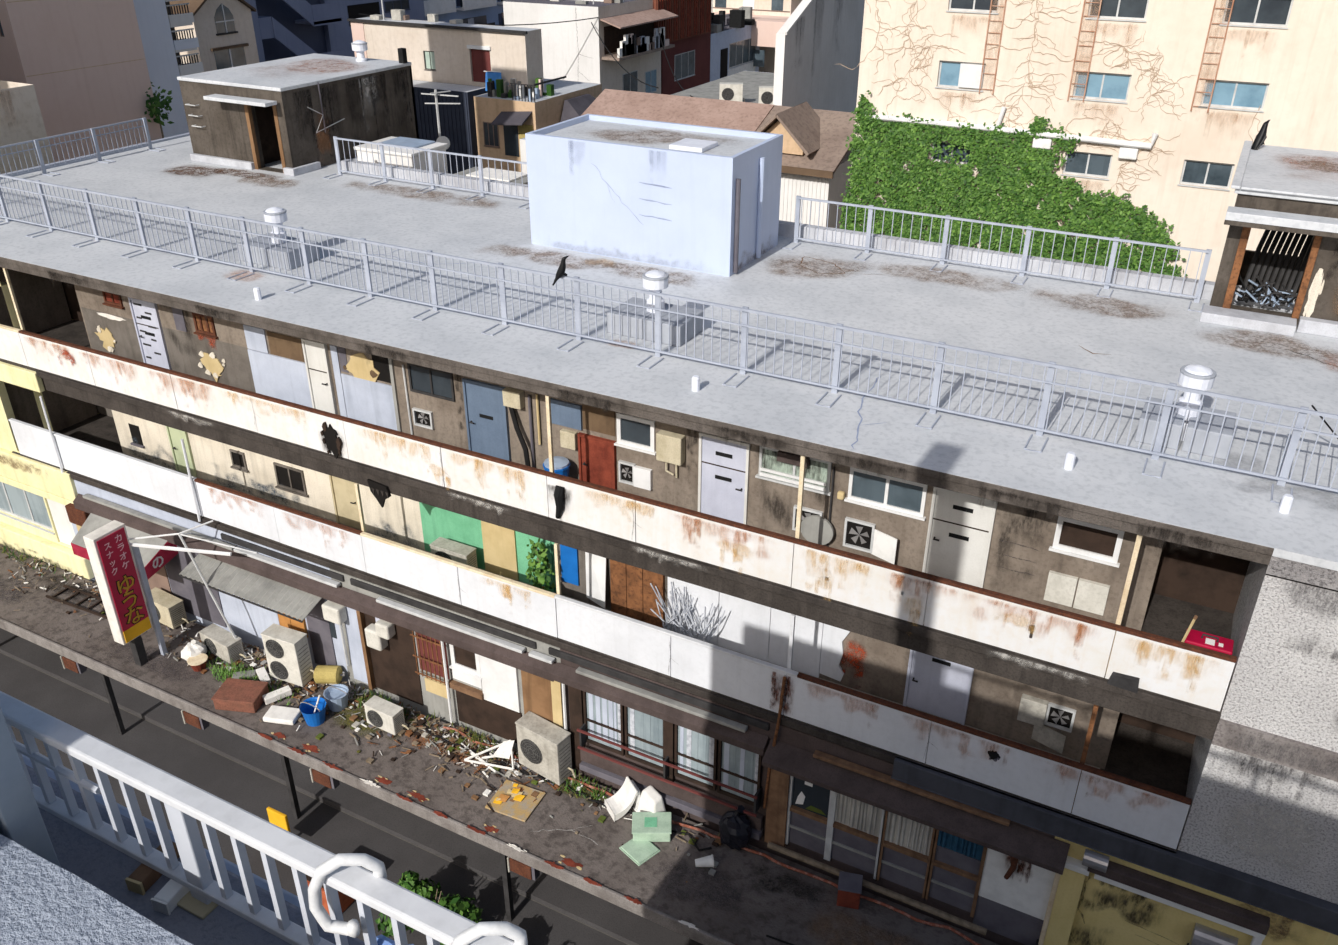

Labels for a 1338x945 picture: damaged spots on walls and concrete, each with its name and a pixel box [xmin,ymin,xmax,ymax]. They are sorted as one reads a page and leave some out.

corrosion [610,559,665,628]
corrosion [841,642,866,677]
corrosion [771,672,791,712]
damp [1087,889,1153,925]